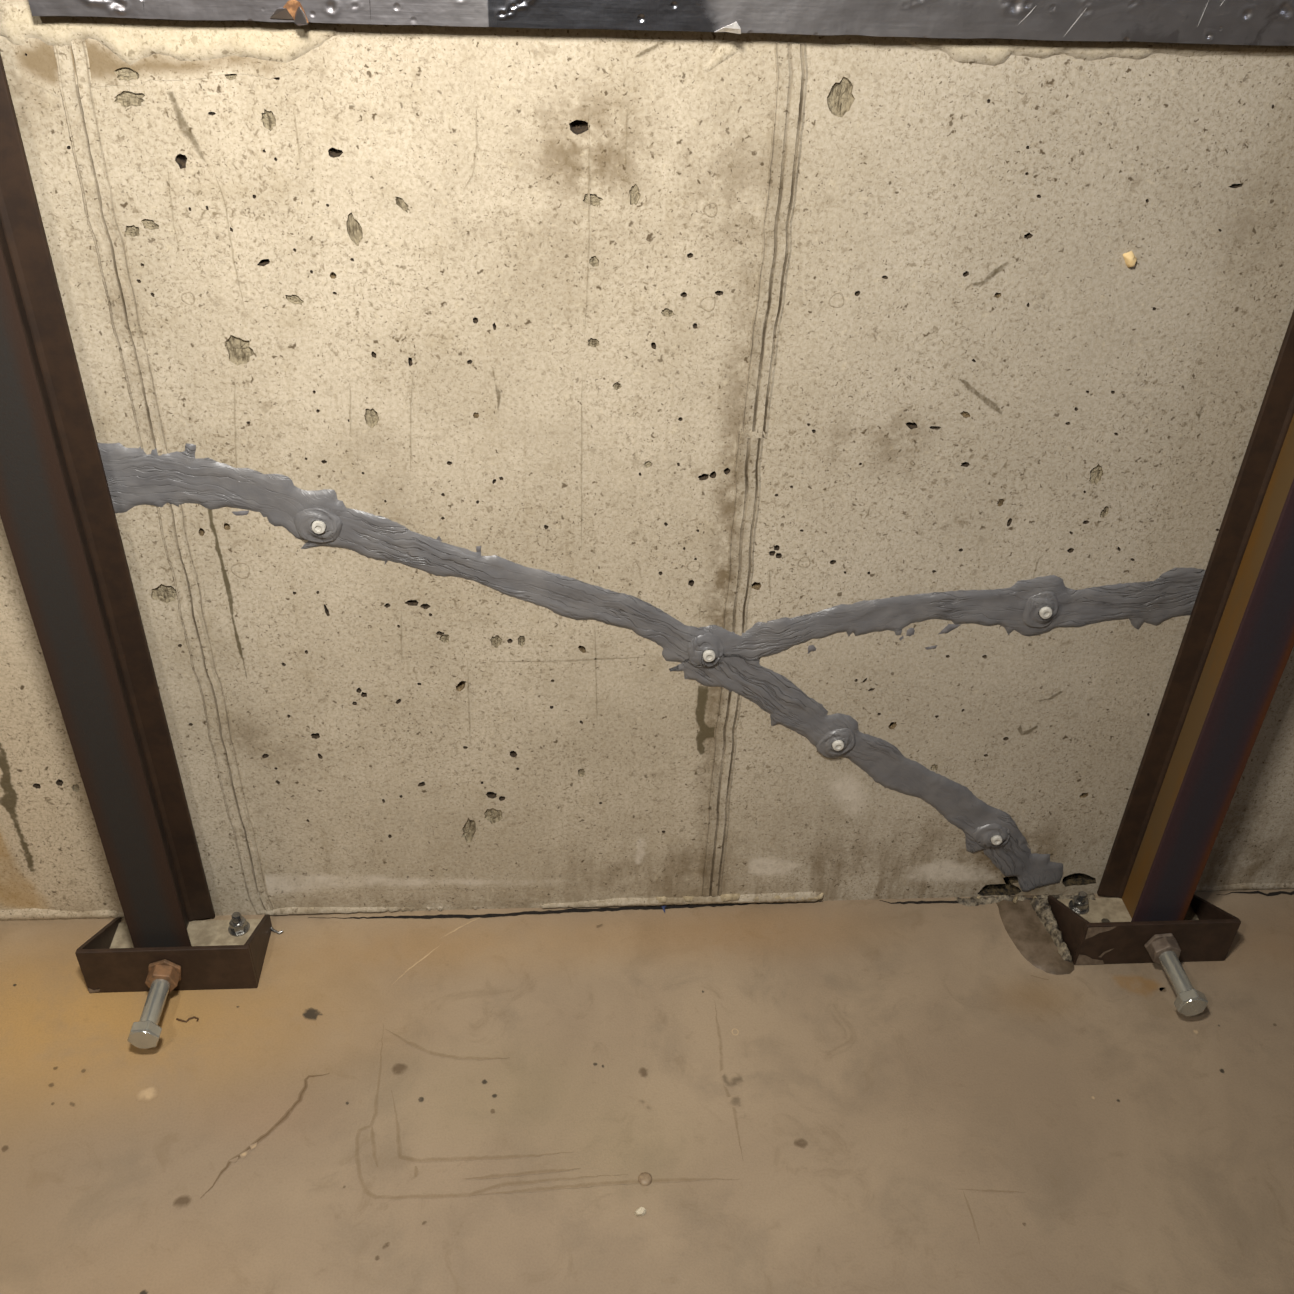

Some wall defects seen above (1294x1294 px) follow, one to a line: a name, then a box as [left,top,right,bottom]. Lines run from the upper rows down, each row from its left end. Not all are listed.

crack [577,376,585,550]
crack [467,625,638,745]
leakage [695,685,715,756]
corrosion [0,814,58,910]
crack [308,901,823,919]
spalling [977,876,1022,896]
spalling [1062,873,1096,887]